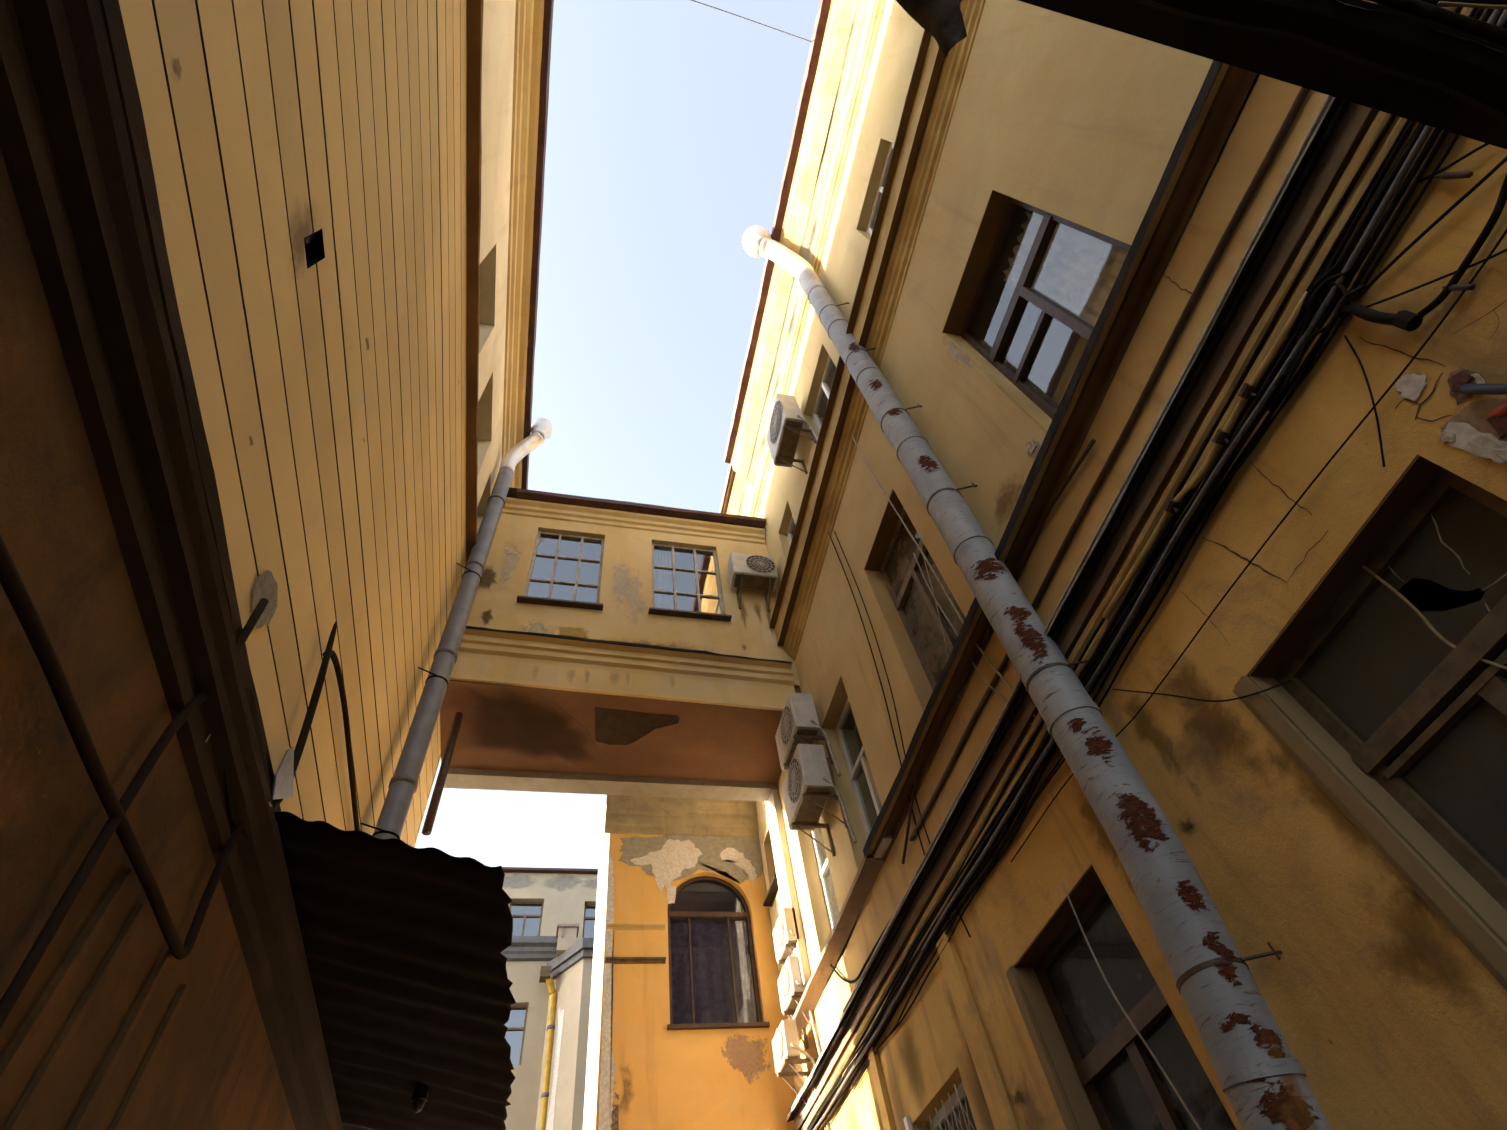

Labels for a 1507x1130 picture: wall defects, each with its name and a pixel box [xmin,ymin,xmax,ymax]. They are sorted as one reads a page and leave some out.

peeling [1395,373,1427,400]
spalling [1437,367,1507,465]
crack [1202,461,1328,583]
corrosion [1004,606,1048,665]
leakage [477,698,582,757]
corrosion [1066,718,1116,767]
leakage [1083,805,1116,858]
corrosion [1115,783,1170,852]
corrosion [1174,880,1210,912]
peeling [598,835,770,1130]
corrosion [1202,931,1243,988]
corrosion [1216,1011,1321,1130]